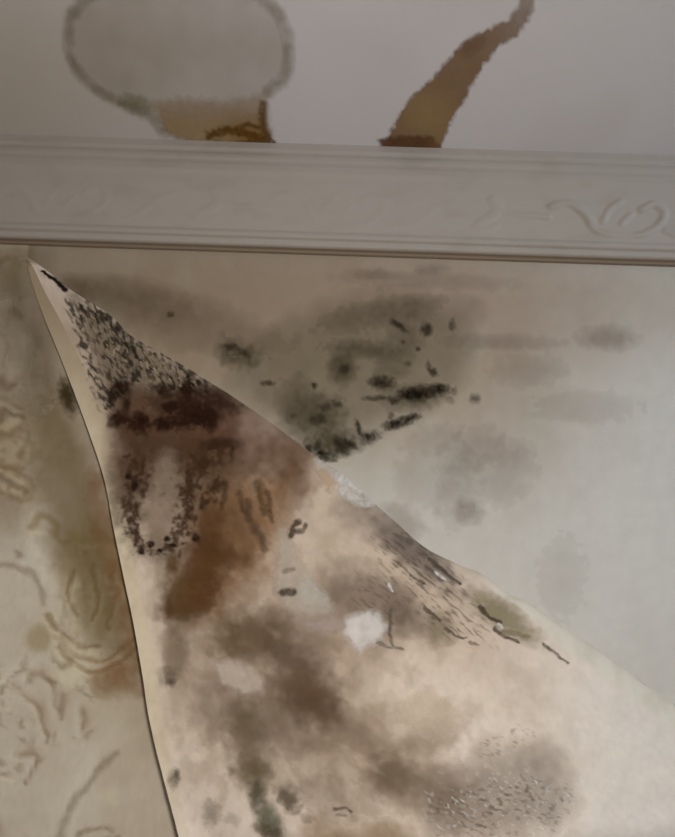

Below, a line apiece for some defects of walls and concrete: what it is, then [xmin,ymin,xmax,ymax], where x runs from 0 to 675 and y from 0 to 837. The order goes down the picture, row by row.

damp [161,103,275,143]
damp [41,270,68,292]
damp [67,286,211,410]
damp [60,383,75,410]
damp [367,376,444,404]
damp [295,400,355,461]
damp [386,415,417,430]
damp [122,442,234,554]
peeling [277,529,330,624]
peeling [344,612,385,652]
peeling [216,660,262,693]
peeling [270,761,299,787]